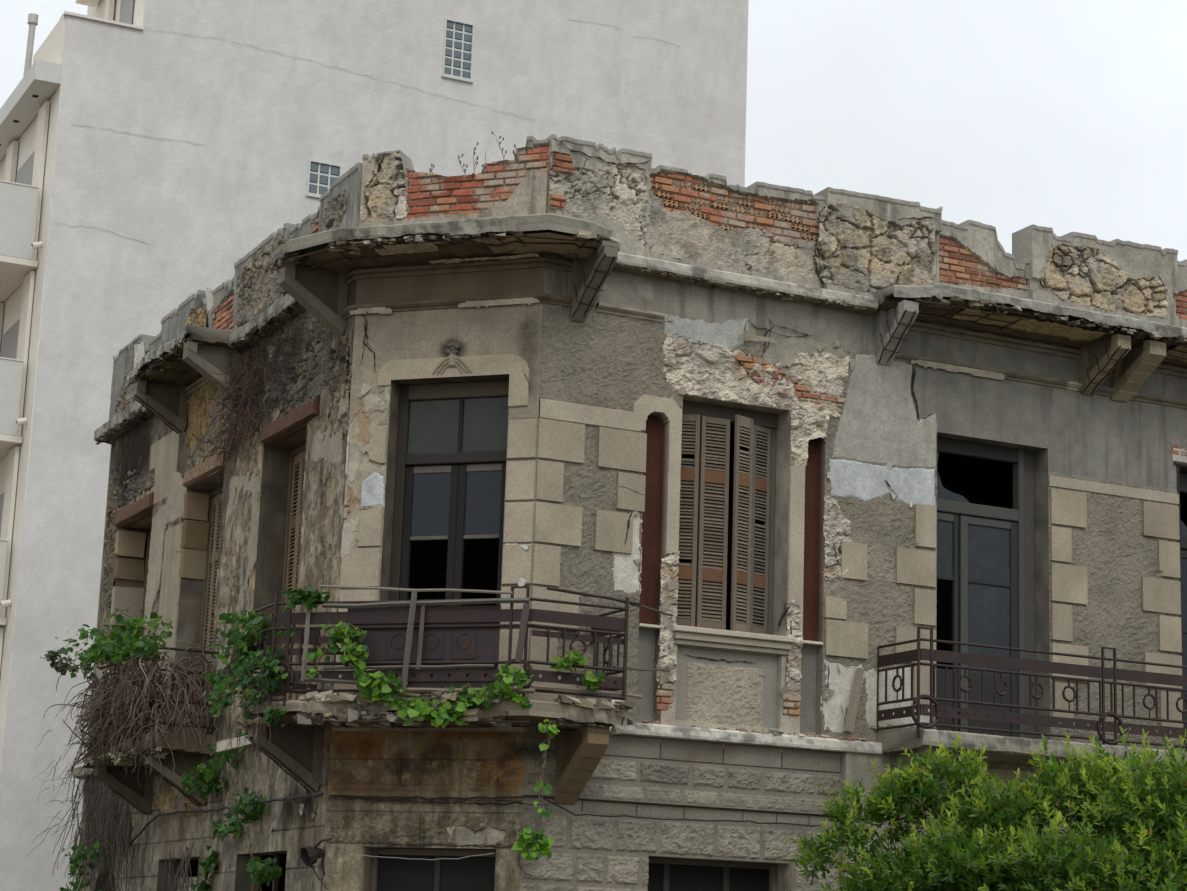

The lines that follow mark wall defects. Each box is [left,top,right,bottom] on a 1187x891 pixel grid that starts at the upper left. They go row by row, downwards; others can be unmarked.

crack [360,314,375,371]
flaking render [96,144,1187,630]
crack [911,364,932,422]